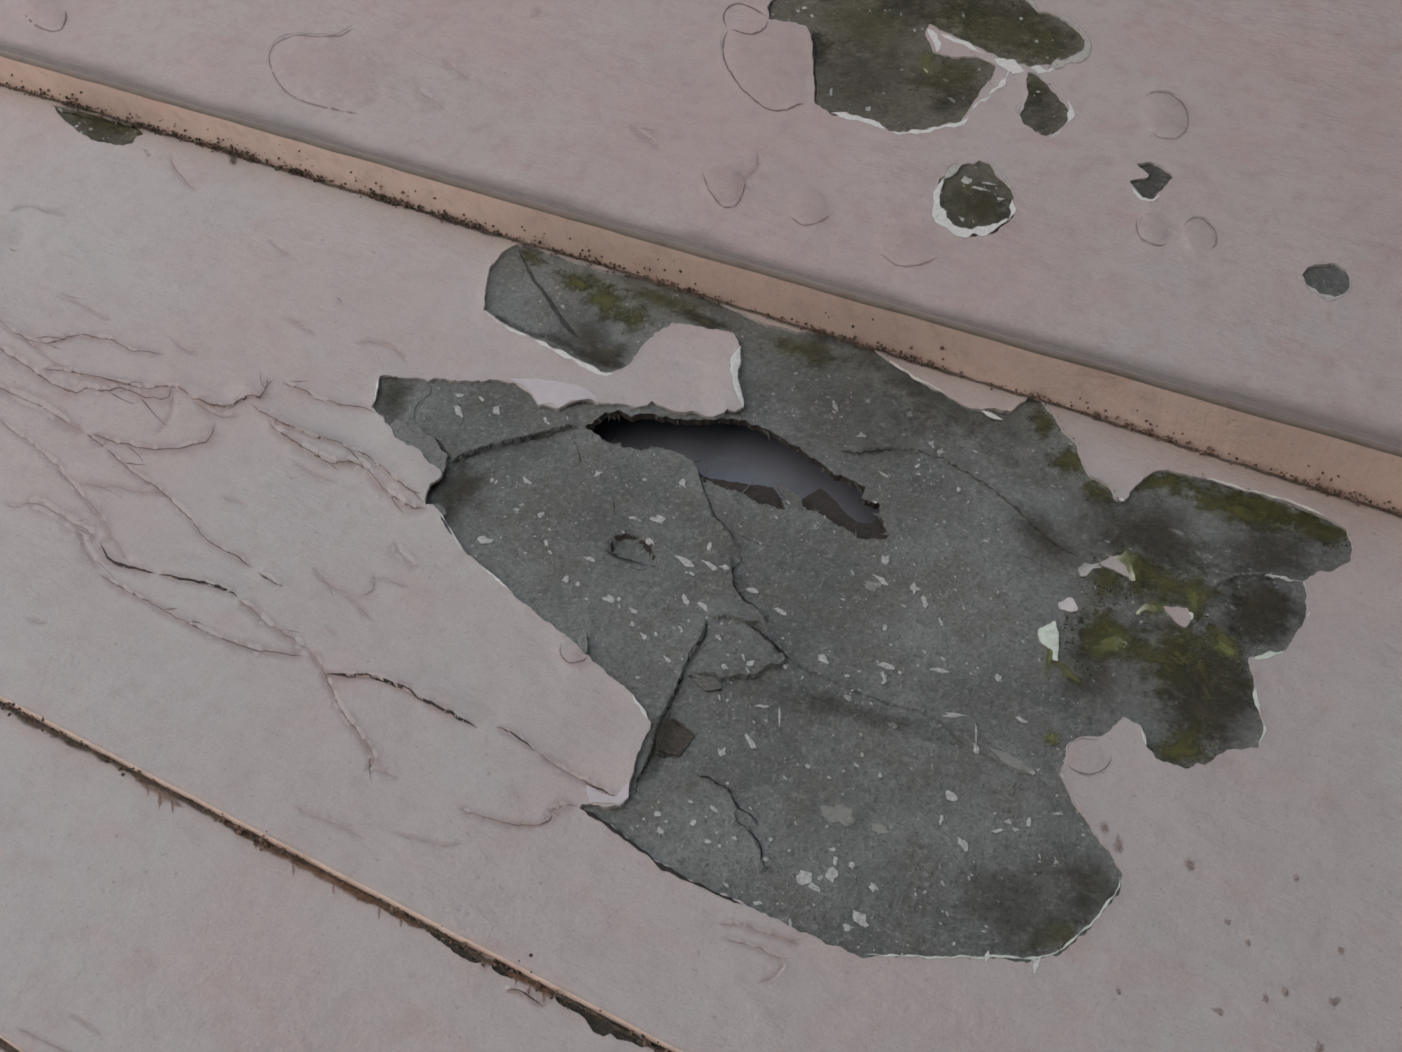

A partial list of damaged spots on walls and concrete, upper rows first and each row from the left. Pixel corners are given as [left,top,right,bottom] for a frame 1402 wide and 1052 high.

peeling [720,0,1092,138]
peeling [931,161,1016,238]
peeling [1130,164,1172,201]
crack [0,321,421,509]
crack [87,434,281,598]
peeling [372,247,1352,978]
crack [330,673,535,751]